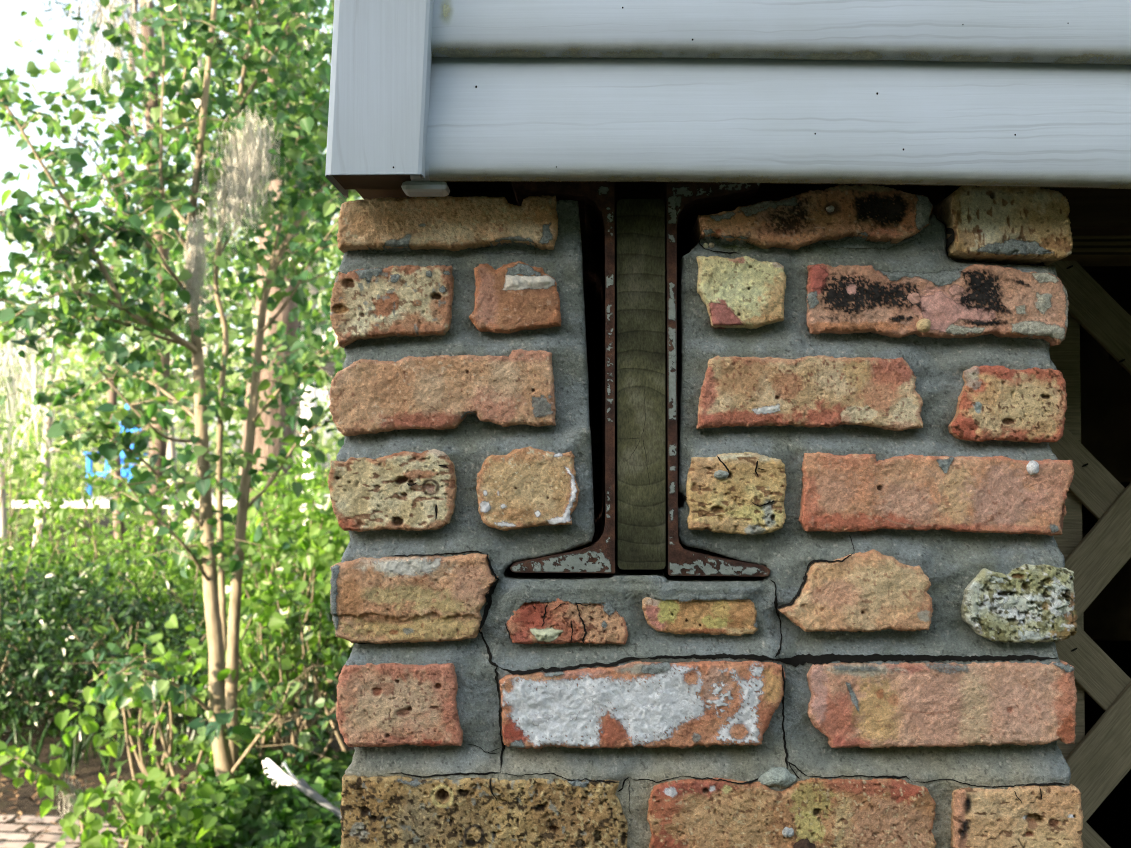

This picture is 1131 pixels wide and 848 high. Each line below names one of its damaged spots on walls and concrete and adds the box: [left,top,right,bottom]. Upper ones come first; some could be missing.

crack [388,535,1071,813]